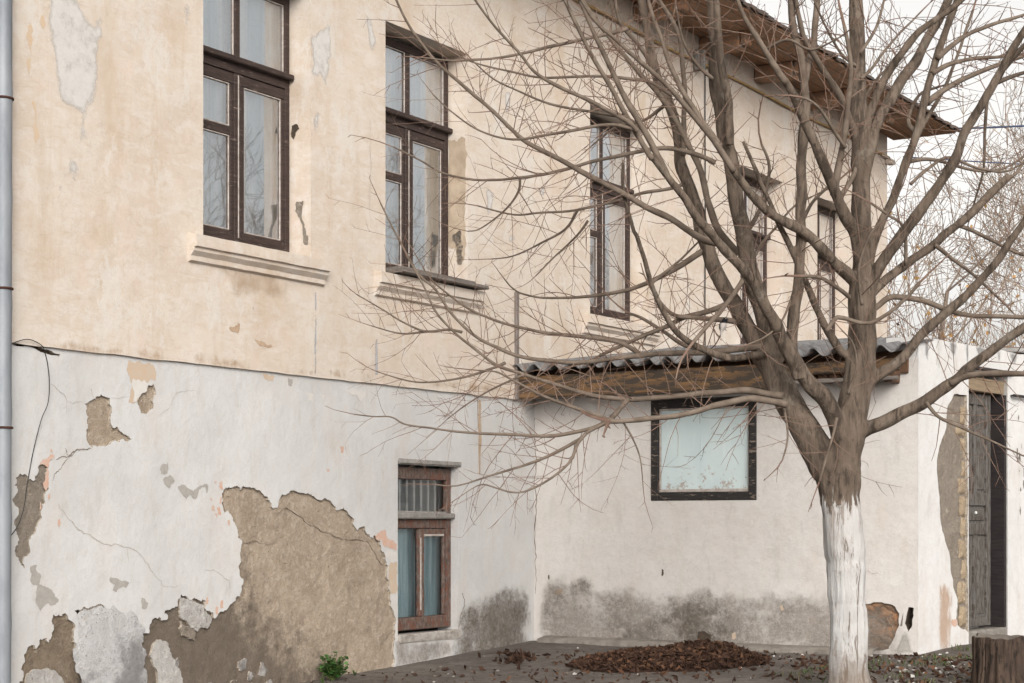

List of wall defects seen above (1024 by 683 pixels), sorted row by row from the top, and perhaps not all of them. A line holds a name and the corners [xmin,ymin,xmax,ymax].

peeling [26,0,101,112]
spalling [295,201,308,245]
peeling [127,361,156,414]
spalling [85,395,131,448]
crack [53,448,179,588]
spalling [937,394,968,632]
spalling [12,448,82,683]
spalling [141,463,398,683]
water stain [463,596,526,653]
water stain [544,581,830,646]
water stain [867,615,887,651]
spalling [866,602,914,651]